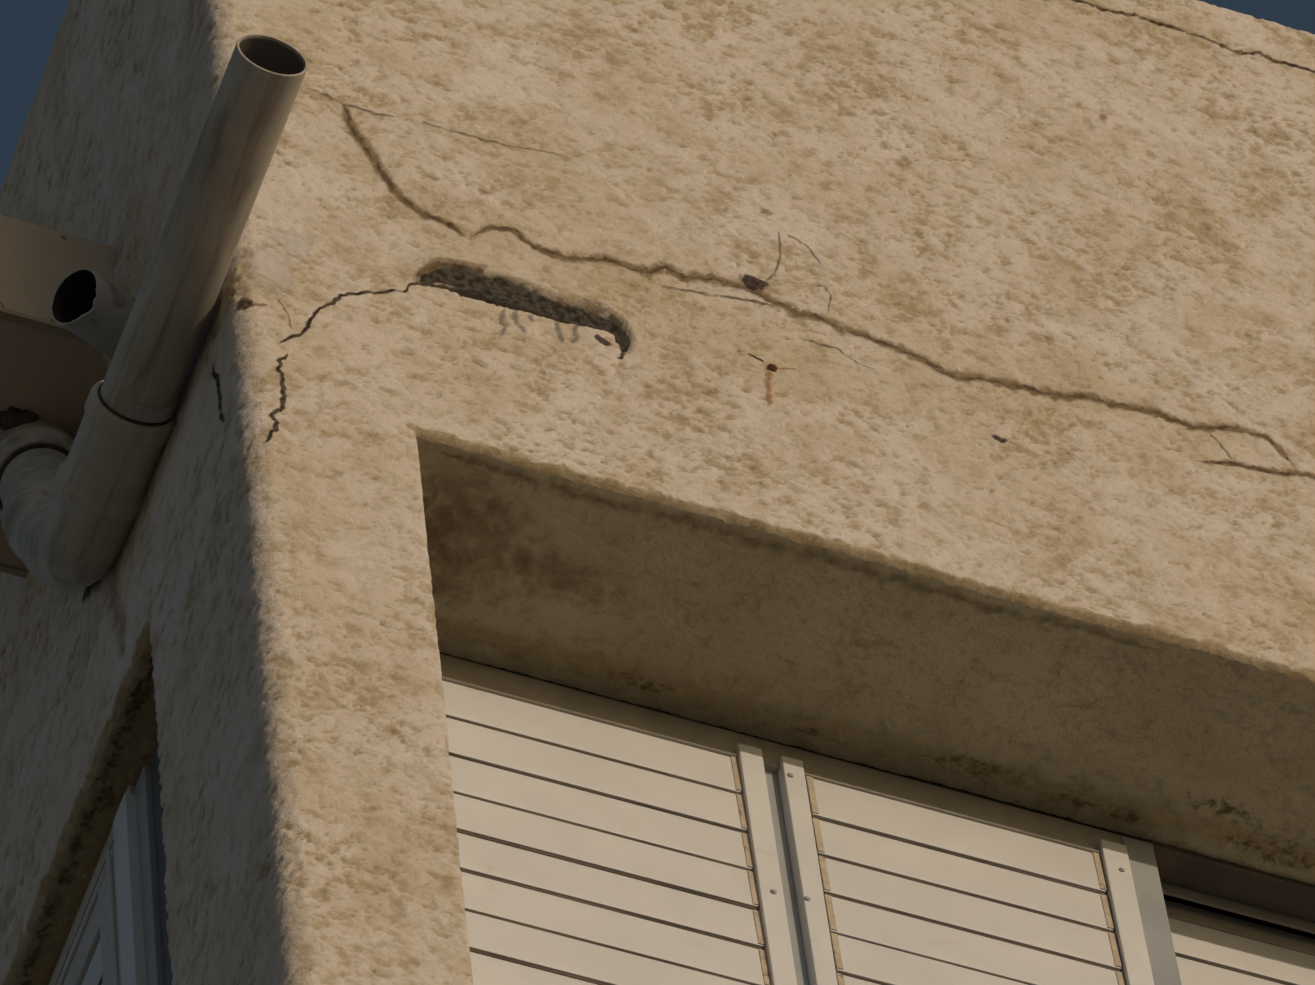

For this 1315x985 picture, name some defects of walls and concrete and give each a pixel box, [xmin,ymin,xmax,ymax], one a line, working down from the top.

crack [1072,0,1315,73]
crack [212,365,224,422]
crack [264,282,419,442]
spalling [418,257,631,359]
crack [309,88,1315,478]
damp [426,486,514,594]